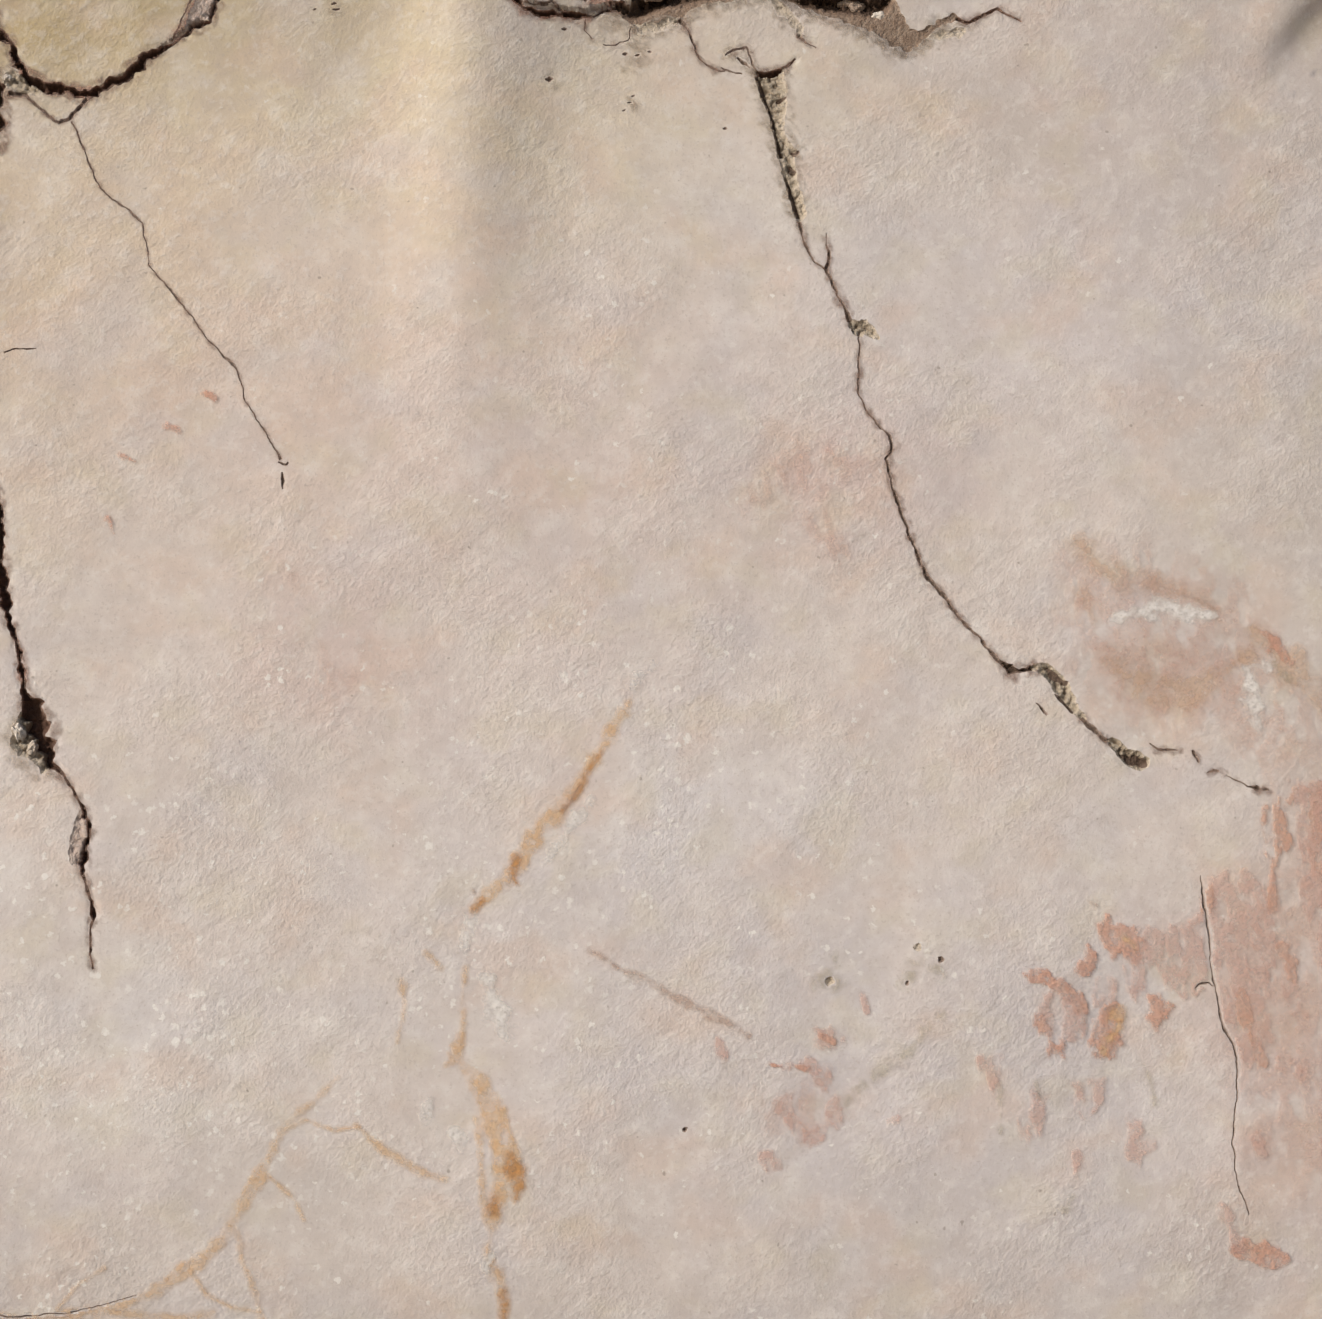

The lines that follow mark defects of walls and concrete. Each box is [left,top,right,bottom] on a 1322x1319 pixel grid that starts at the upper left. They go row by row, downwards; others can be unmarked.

crack [0,0,289,489]
crack [512,0,1271,793]
crack [0,502,96,970]
corrosion [448,1076,524,1222]
corrosion [459,714,621,949]
crack [1195,875,1249,1215]